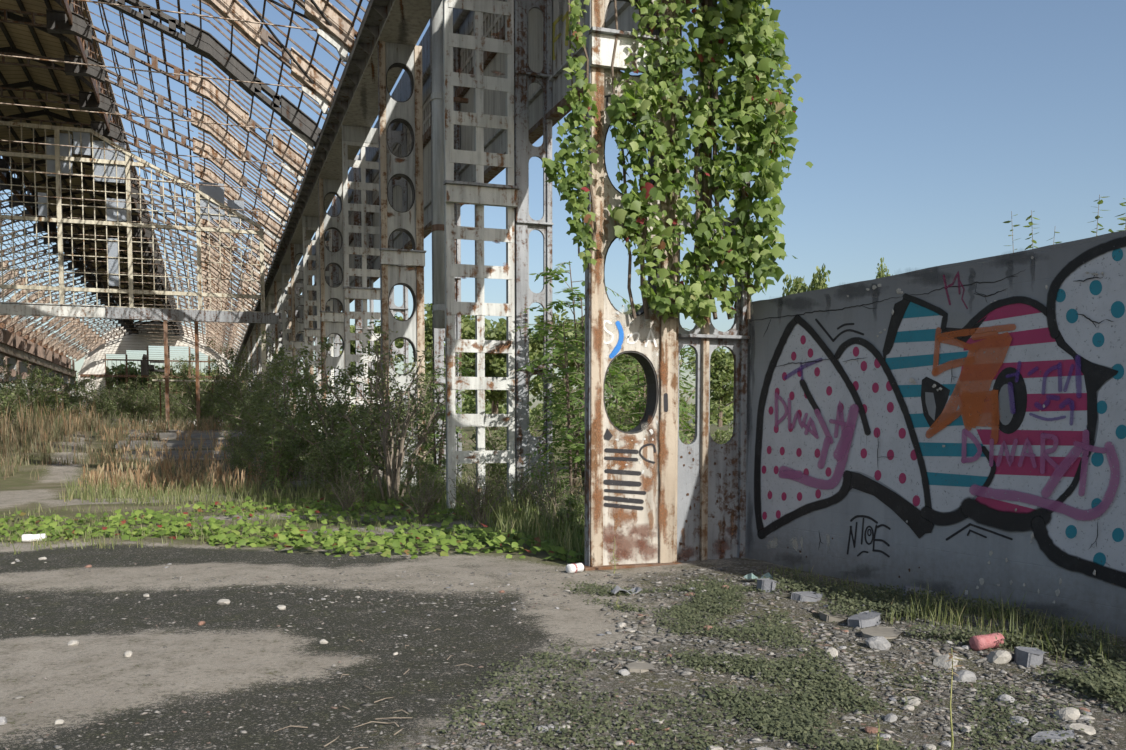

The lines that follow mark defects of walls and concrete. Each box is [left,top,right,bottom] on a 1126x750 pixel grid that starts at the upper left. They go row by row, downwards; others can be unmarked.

corrosion [594,67,602,153]
corrosion [595,201,603,284]
corrosion [472,340,512,354]
corrosion [593,314,603,362]
corrosion [660,341,668,386]
corrosion [594,388,668,560]